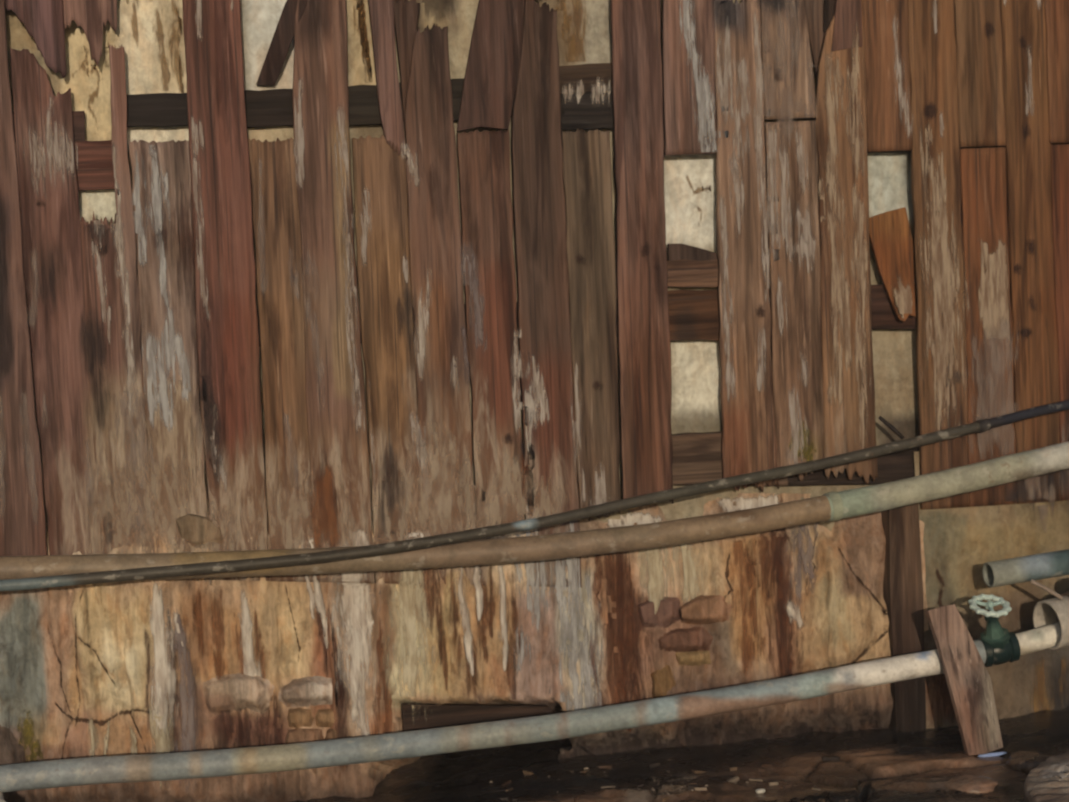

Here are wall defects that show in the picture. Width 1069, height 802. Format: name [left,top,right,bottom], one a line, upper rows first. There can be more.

crack [48,594,150,759]
damp [149,584,197,754]
damp [305,572,374,736]
damp [498,557,602,712]